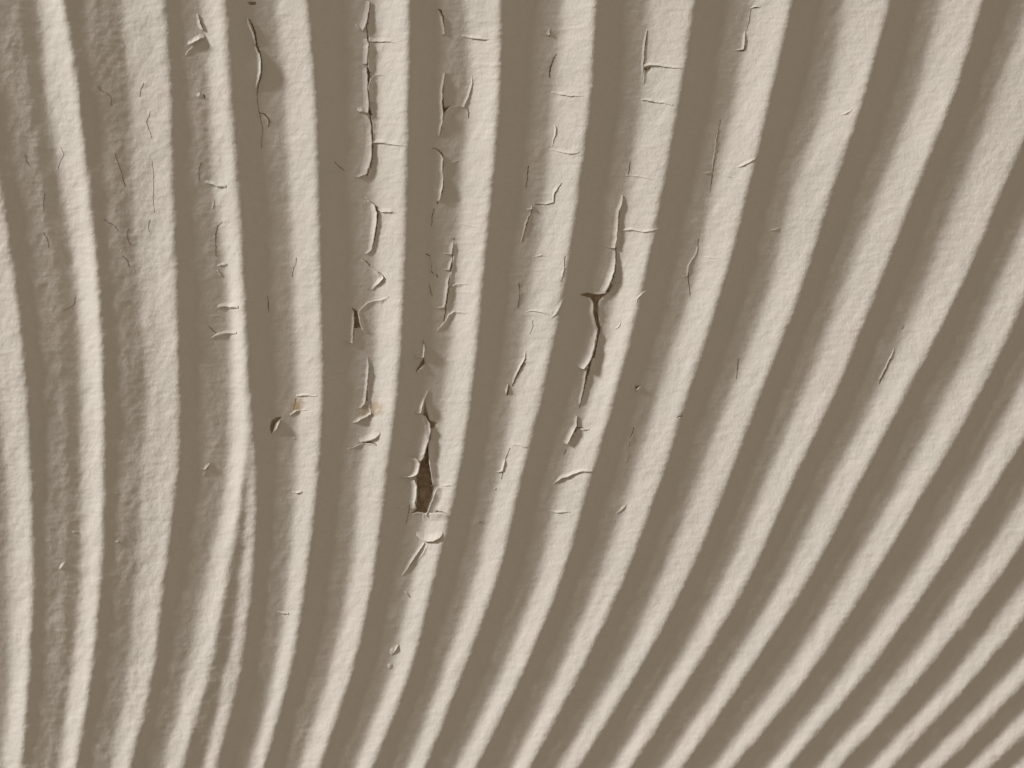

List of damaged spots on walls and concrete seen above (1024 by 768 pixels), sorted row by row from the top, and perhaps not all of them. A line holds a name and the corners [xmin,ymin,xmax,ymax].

peeling [185,14,205,56]
peeling [353,356,375,423]
peeling [270,417,281,433]
peeling [348,432,380,450]
peeling [397,390,452,523]